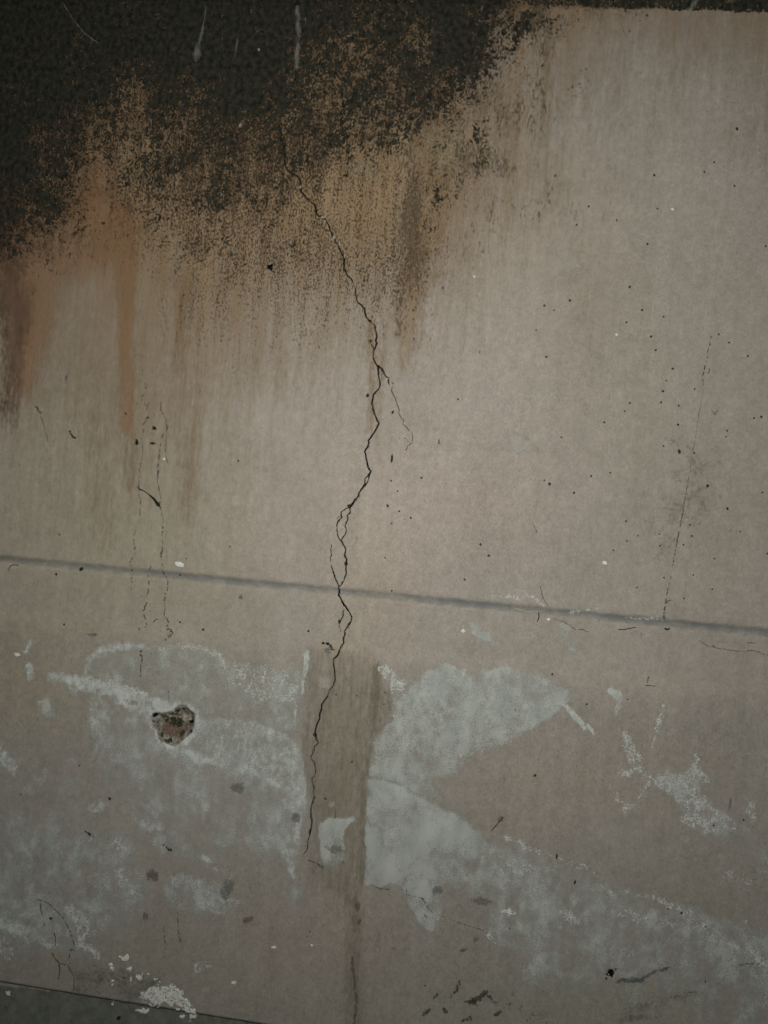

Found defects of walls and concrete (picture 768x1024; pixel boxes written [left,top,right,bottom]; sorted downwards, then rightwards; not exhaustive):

damp [0,0,768,348]
crack [278,111,413,868]
spalling [51,672,307,905]